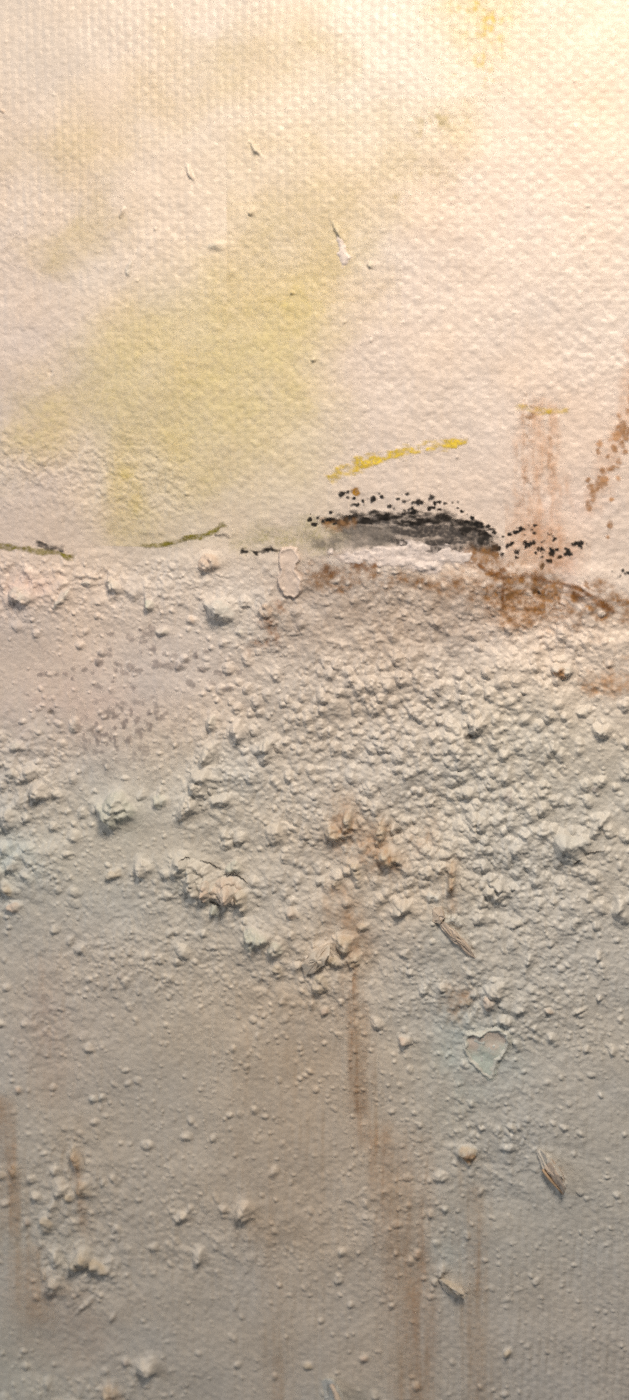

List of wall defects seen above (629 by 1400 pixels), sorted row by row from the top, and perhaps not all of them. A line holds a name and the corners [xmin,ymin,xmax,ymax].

rust [586,409,629,511]
leakage [325,510,495,544]
peeling [277,546,304,599]
rust [465,548,629,626]